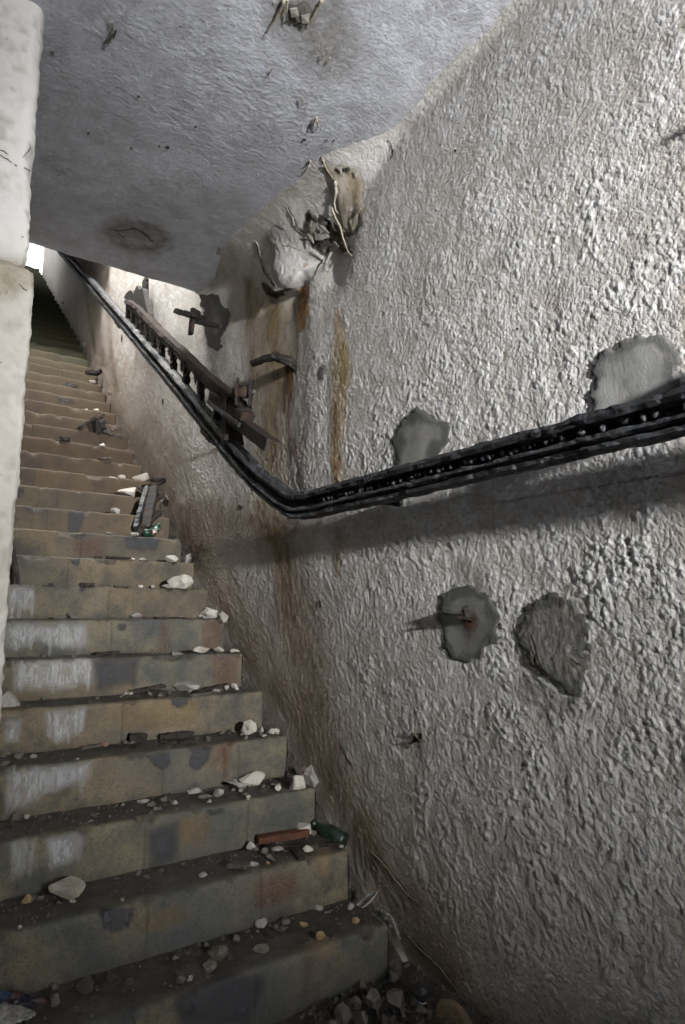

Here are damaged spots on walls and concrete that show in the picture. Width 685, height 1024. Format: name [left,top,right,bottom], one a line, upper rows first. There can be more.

flaking render [303,164,366,255]
spalling [261,283,299,298]